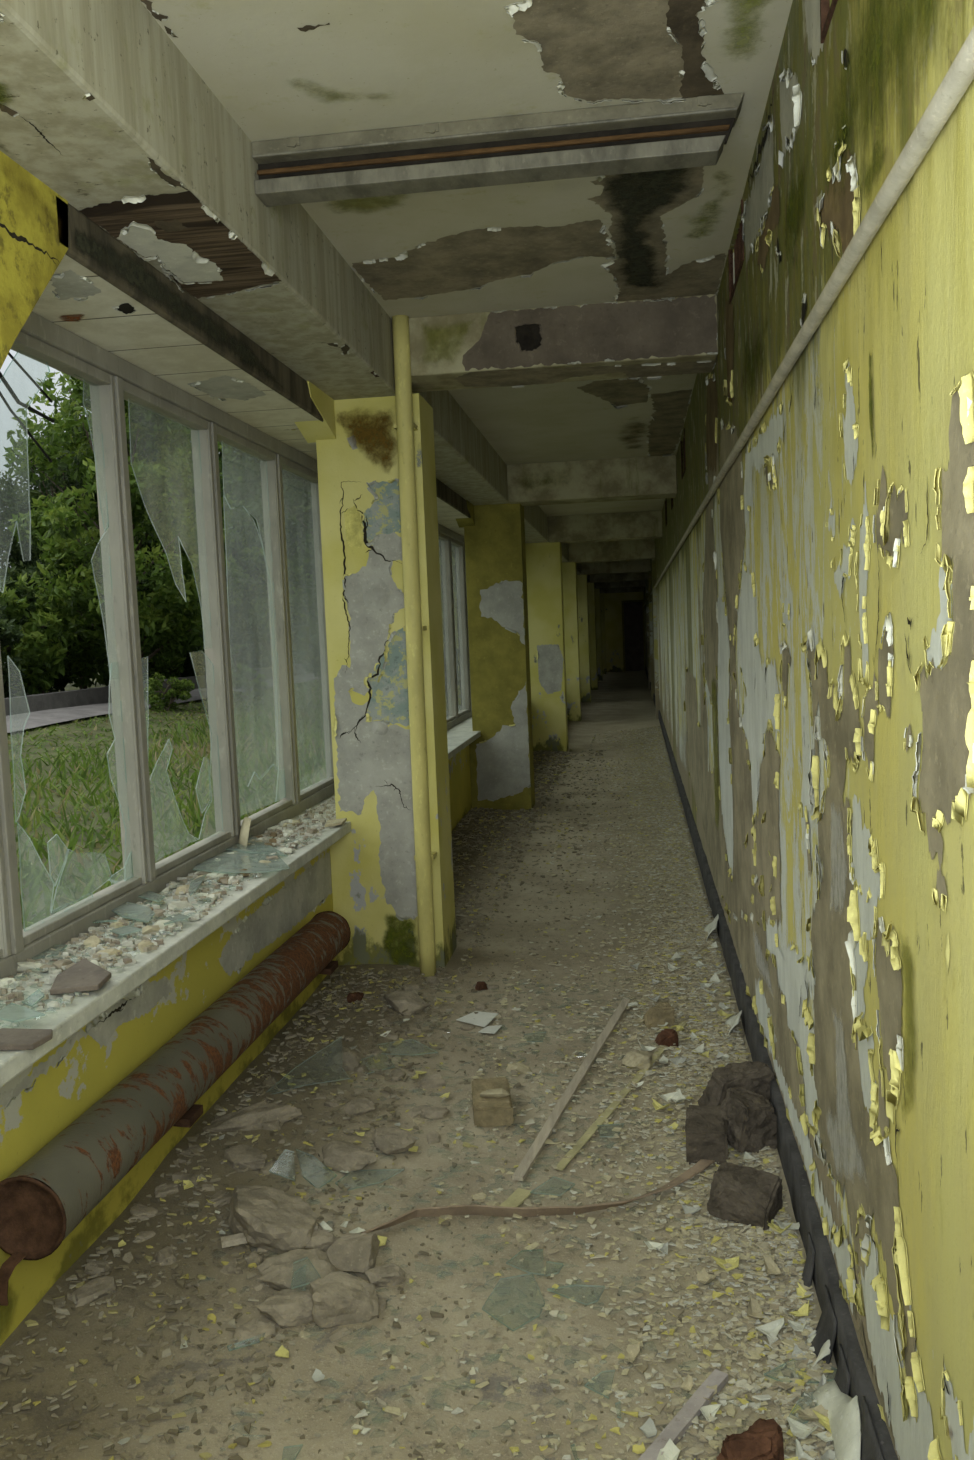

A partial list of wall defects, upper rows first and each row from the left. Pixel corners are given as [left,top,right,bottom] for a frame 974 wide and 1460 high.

peeling [504,0,721,104]
crack [0,223,60,264]
spalling [79,157,281,299]
flaking render [741,68,802,273]
mould [337,413,395,468]
crack [339,481,402,741]
flaking render [333,478,418,921]
flaking render [903,372,974,913]
flaking render [351,166,963,1460]